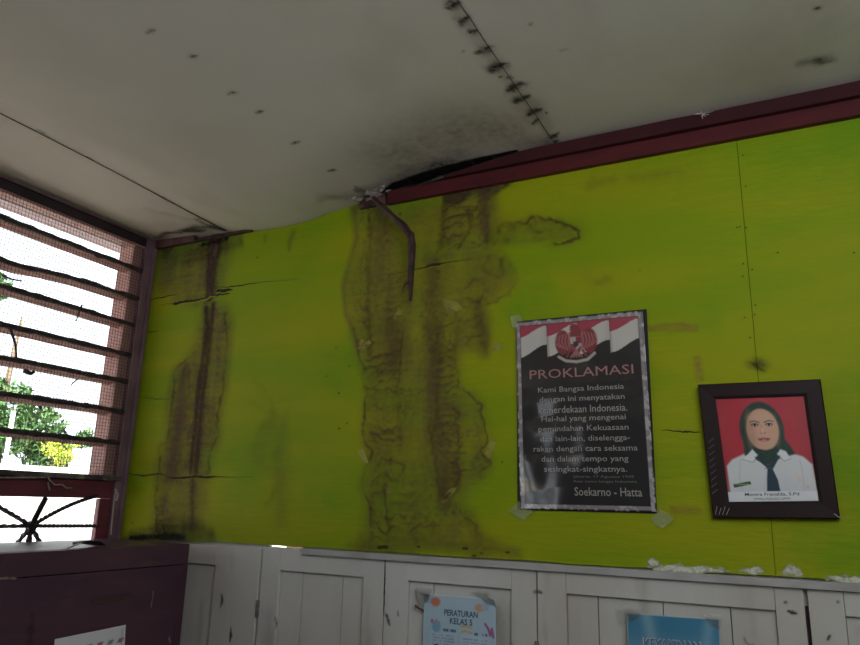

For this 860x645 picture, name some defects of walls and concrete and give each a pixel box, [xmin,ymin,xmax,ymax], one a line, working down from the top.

crack [151,279,292,307]
leakage [128,222,242,542]
crack [129,472,256,480]
peeling [647,558,730,573]
peeling [783,565,802,576]
peeling [825,574,860,583]